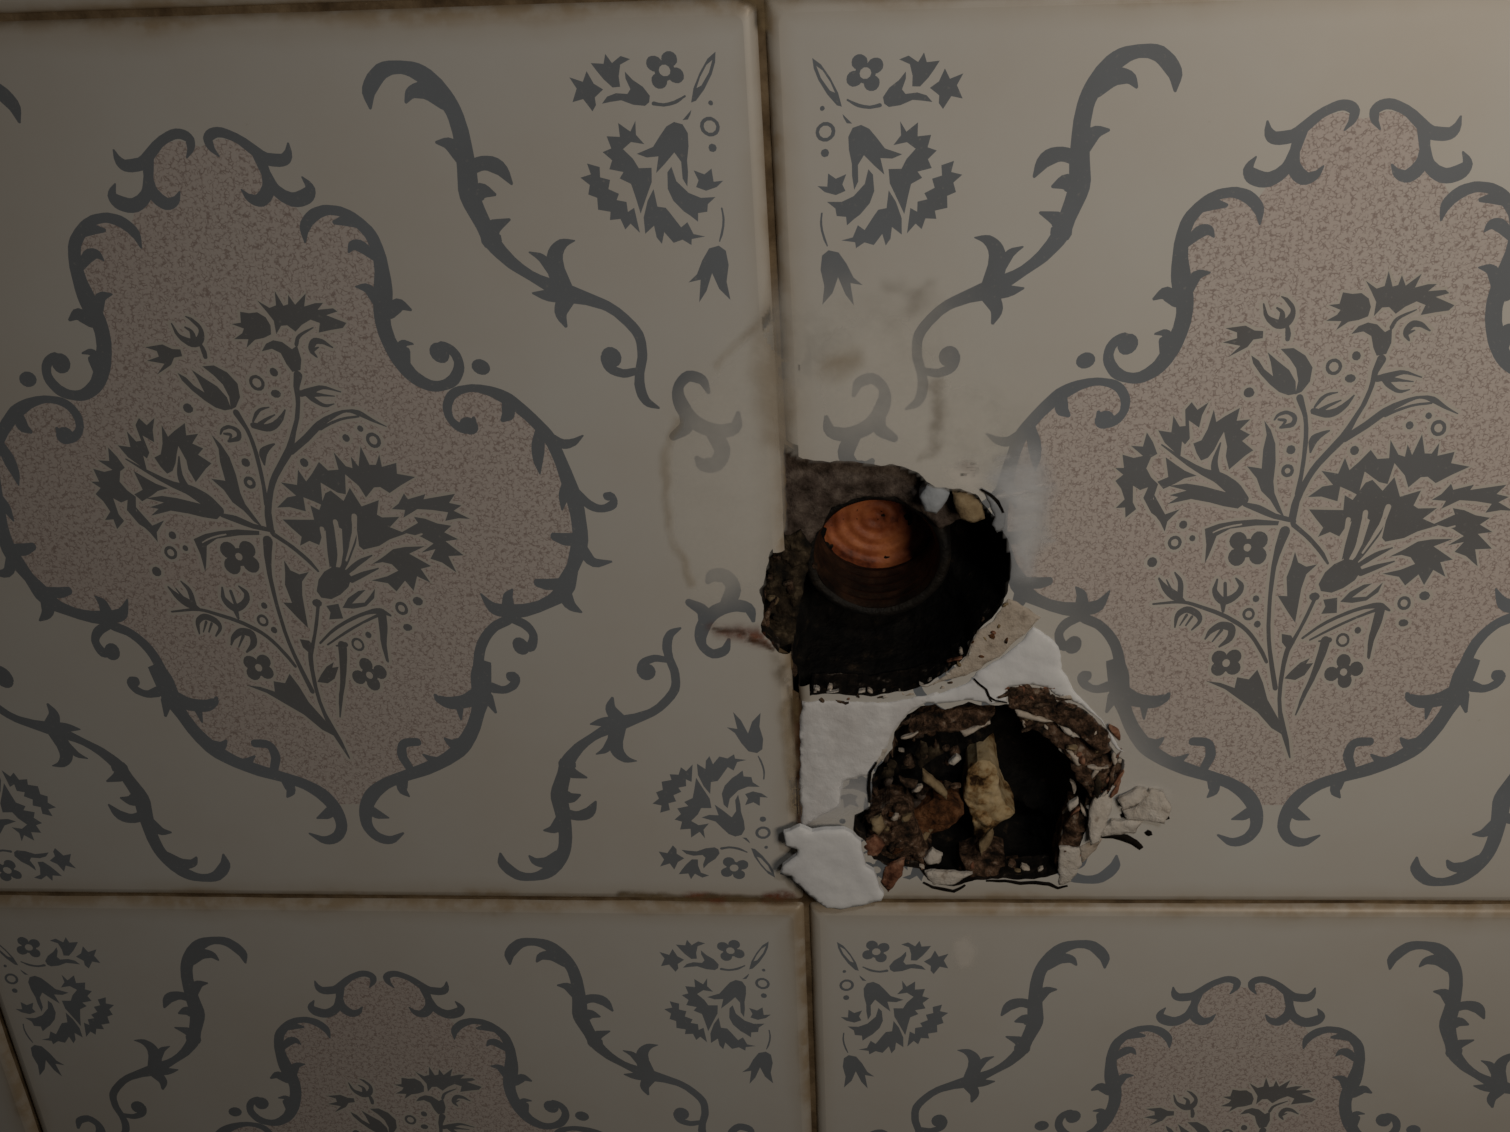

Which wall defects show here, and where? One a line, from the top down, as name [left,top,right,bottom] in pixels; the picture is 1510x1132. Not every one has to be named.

spalling [761,444,1172,909]